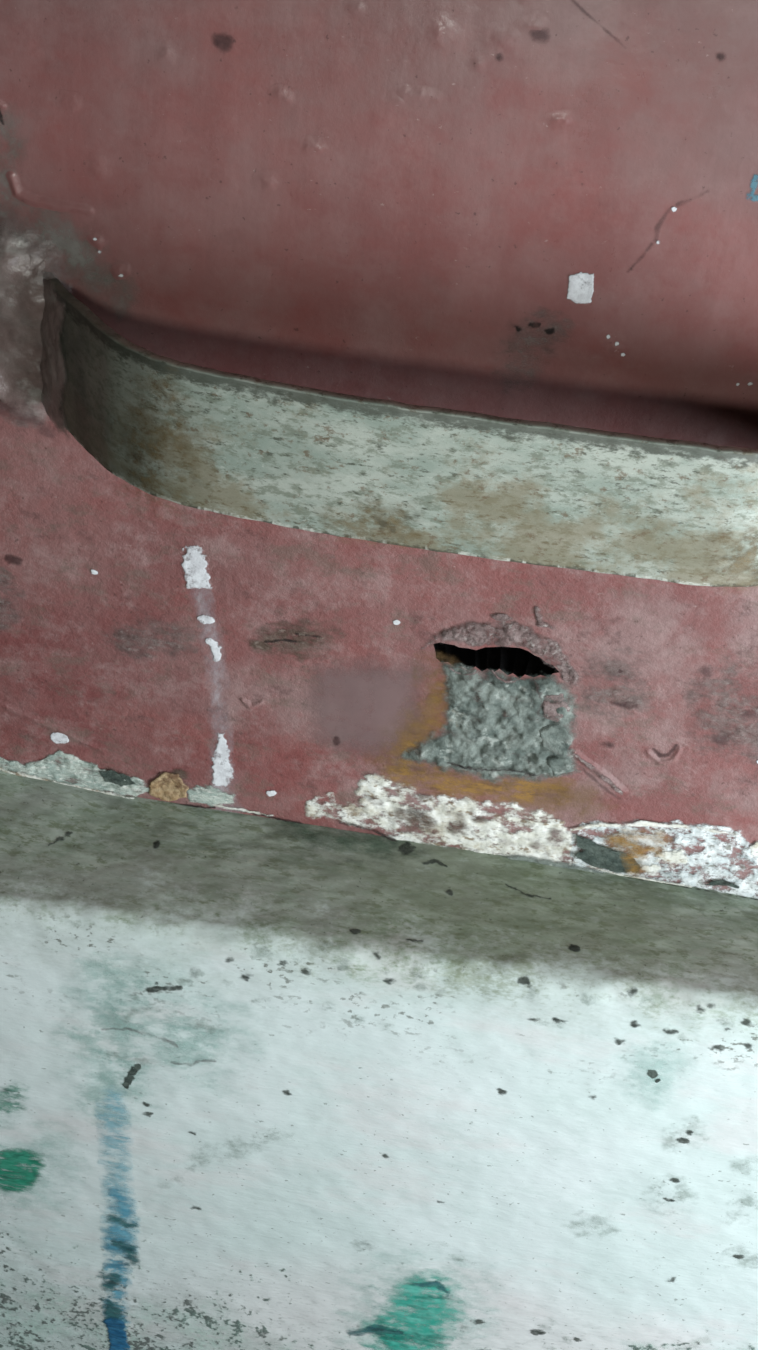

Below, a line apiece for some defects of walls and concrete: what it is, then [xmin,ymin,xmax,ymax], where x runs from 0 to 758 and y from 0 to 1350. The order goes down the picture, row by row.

corrosion [722,537,758,577]
flaking render [402,607,579,782]
corrosion [389,761,567,802]
peeling [306,775,758,899]